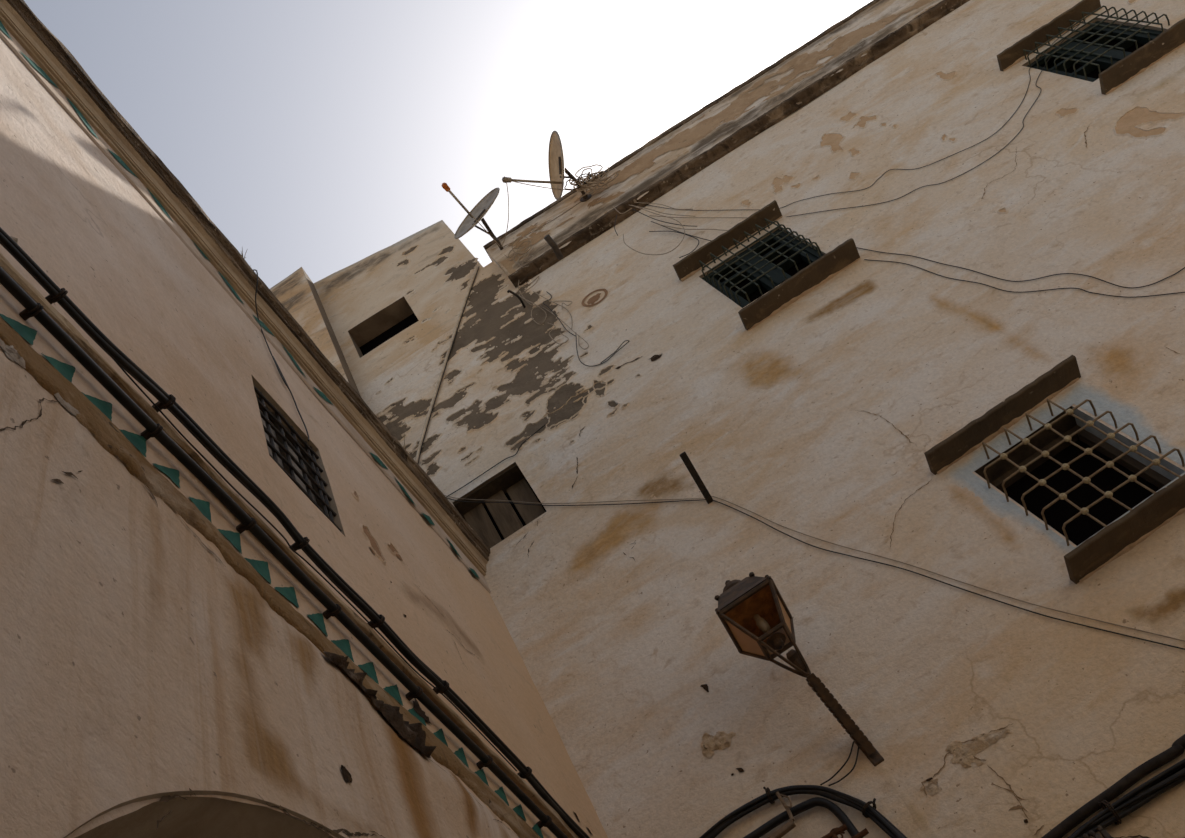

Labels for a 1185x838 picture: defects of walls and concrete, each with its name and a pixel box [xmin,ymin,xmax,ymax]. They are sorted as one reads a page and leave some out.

peeling [1113,106,1185,139]
peeling [376,0,943,477]
crack [0,346,94,435]
crack [52,471,82,484]
peeling [359,524,403,566]
damp [562,494,671,583]
damp [1123,582,1185,631]
spalling [323,651,436,758]
spalling [700,731,737,758]
crack [921,723,1044,836]
crack [156,788,196,830]
crack [260,796,385,838]